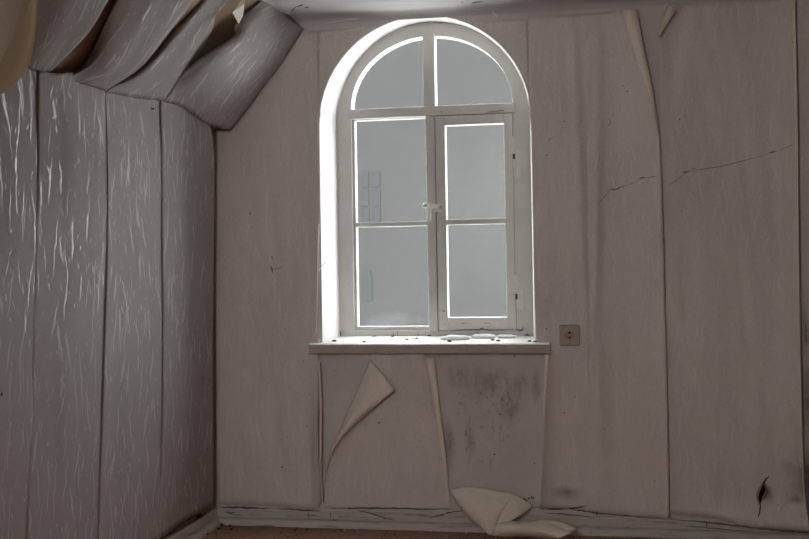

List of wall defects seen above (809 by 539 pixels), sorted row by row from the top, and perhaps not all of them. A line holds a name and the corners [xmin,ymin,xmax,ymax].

crack [599,144,794,203]